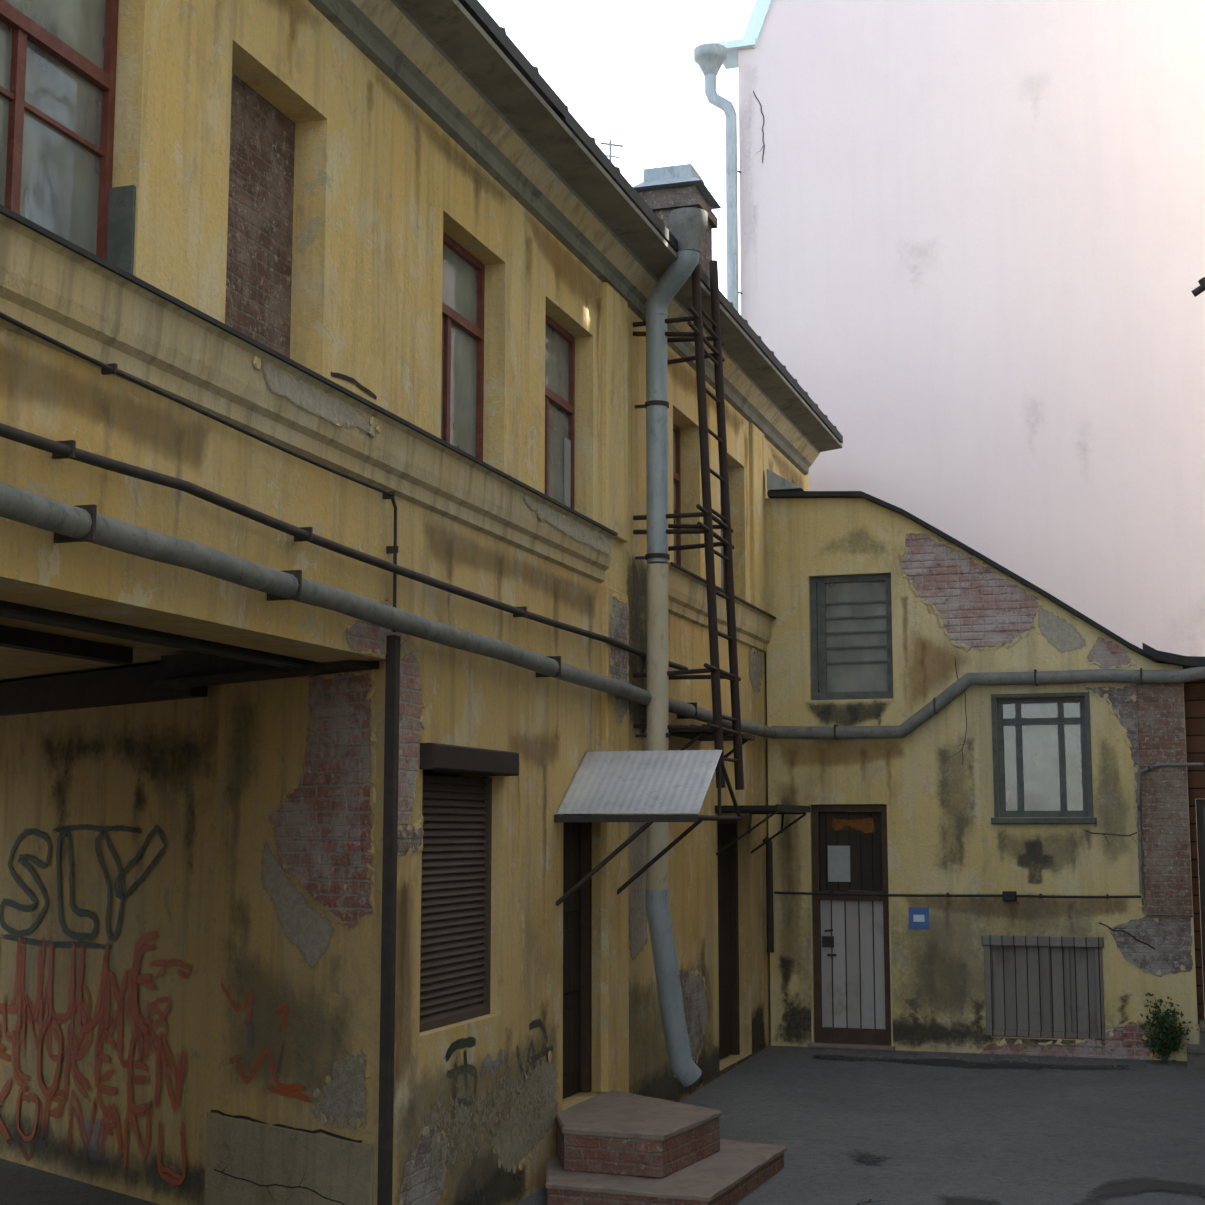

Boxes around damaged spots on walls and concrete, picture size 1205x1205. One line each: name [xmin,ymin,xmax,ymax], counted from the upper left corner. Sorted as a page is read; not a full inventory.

flaking render [261,618,426,967]
water stain [810,702,887,726]
flaking render [896,530,1195,977]
peeling [311,1049,371,1129]
peeling [395,1048,559,1205]
flaking render [679,964,709,1064]
water stain [629,990,766,1102]
water stain [780,957,812,1043]
water stain [815,946,1183,1070]
crack [214,1164,345,1205]